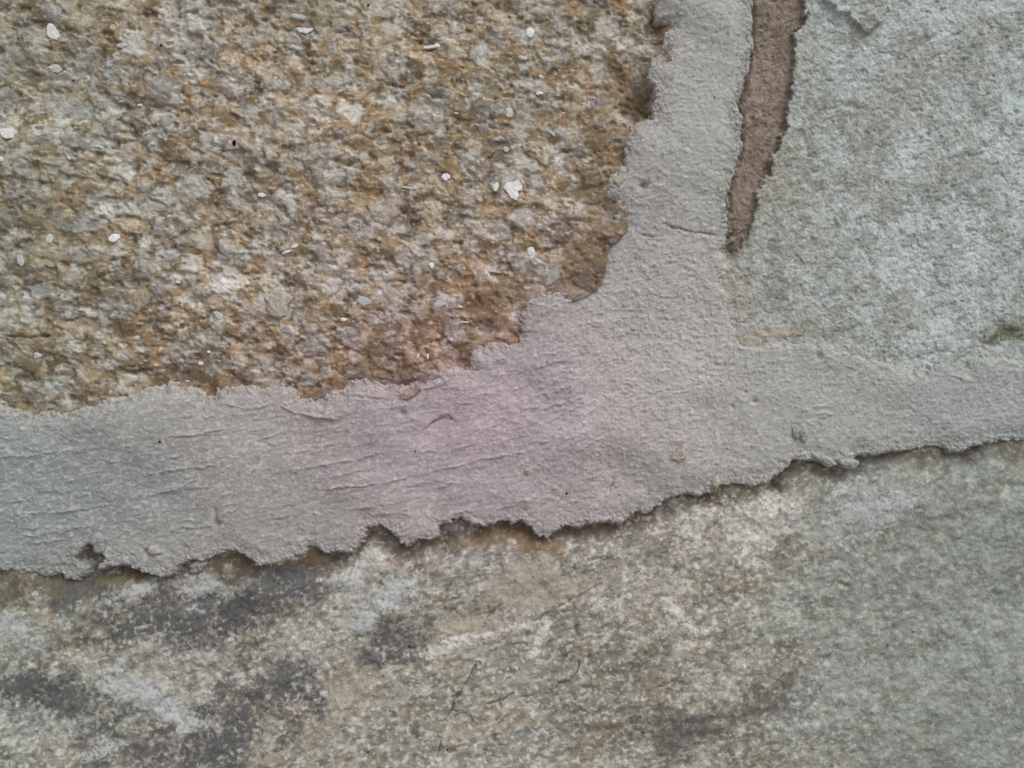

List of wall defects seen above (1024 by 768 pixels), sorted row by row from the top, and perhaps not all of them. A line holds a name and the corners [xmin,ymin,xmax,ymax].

peeling [47,23,60,40]
peeling [291,14,313,34]
peeling [0,128,16,139]
peeling [725,0,809,254]
peeling [493,181,522,200]